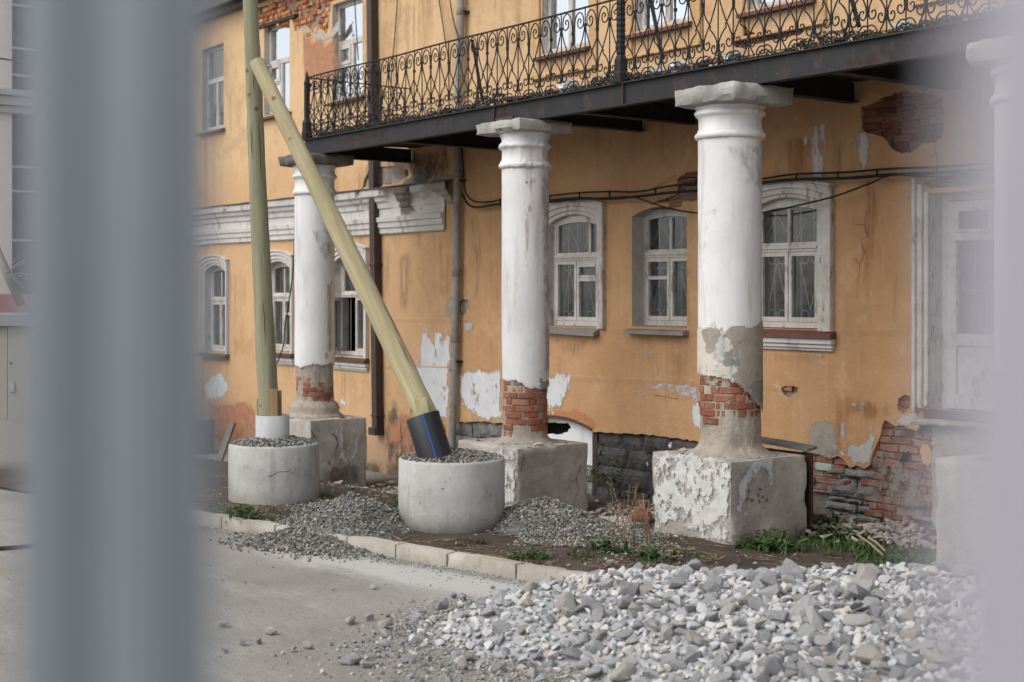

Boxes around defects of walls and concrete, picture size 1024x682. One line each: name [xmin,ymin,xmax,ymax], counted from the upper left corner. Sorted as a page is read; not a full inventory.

flaking render [258,0,341,41]
flaking render [862,90,945,153]
flaking render [296,376,345,406]
peeling [415,329,571,437]
peeling [647,321,763,430]
peeling [647,442,731,541]
flaking render [808,395,934,522]